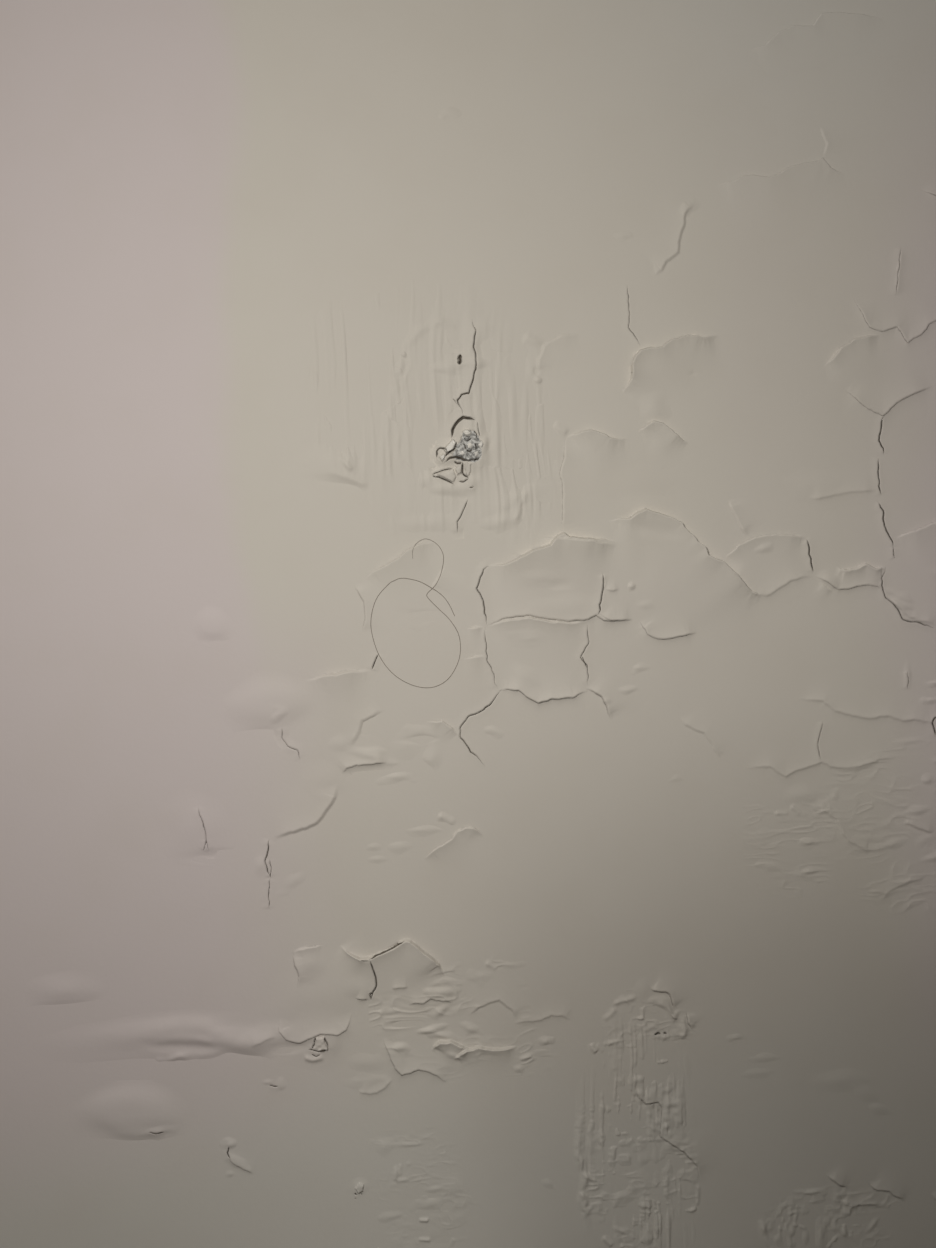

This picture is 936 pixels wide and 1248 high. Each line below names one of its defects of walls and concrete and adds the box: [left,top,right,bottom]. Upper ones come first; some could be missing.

crack [444,308,485,417]
crack [446,493,478,539]
crack [866,418,906,570]
flaking render [275,1037,356,1072]